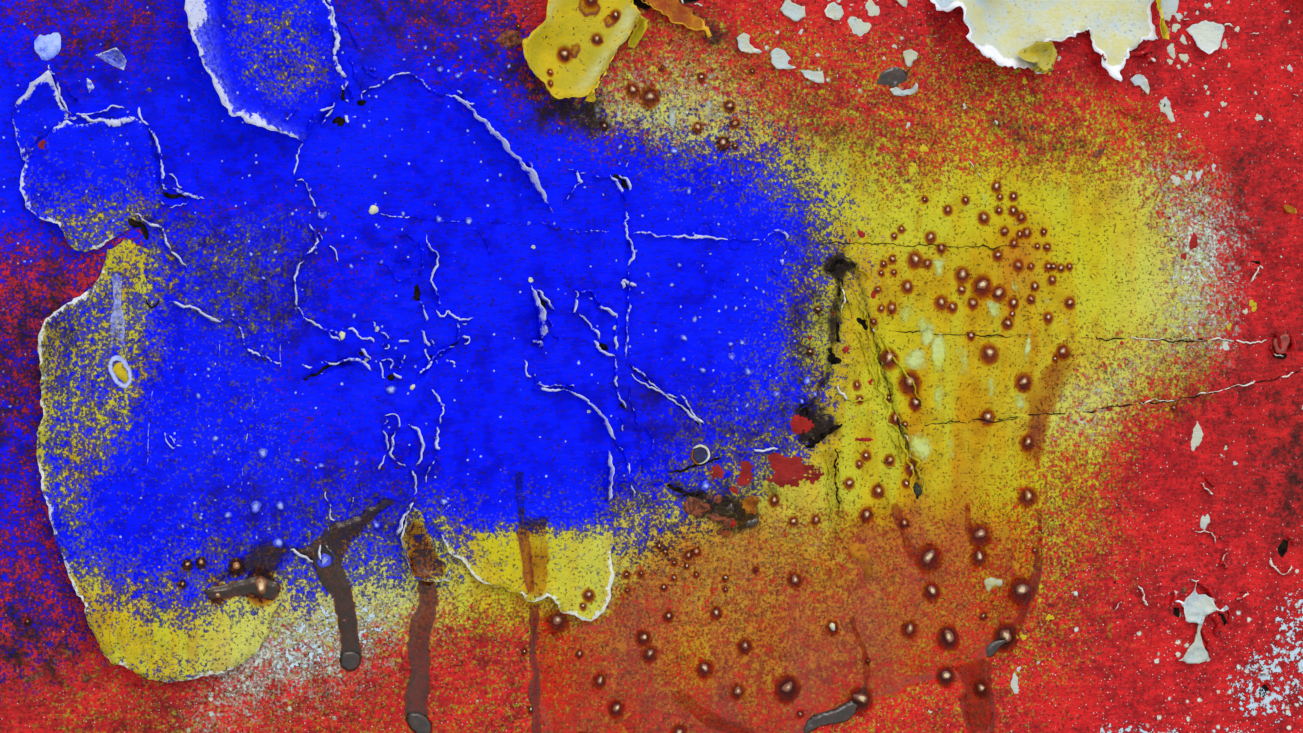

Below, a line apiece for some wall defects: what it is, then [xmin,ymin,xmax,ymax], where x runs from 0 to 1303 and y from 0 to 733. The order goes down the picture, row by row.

peeling [184,0,348,139]
peeling [522,0,712,102]
peeling [930,0,1169,107]
crack [48,65,204,268]
crack [145,0,1302,537]
peeling [12,70,307,683]
corrosion [204,547,281,600]
corrosion [297,499,392,672]
corrosion [404,525,442,733]
peeling [401,489,615,621]
corrosion [517,508,551,733]
corrosion [788,542,938,733]